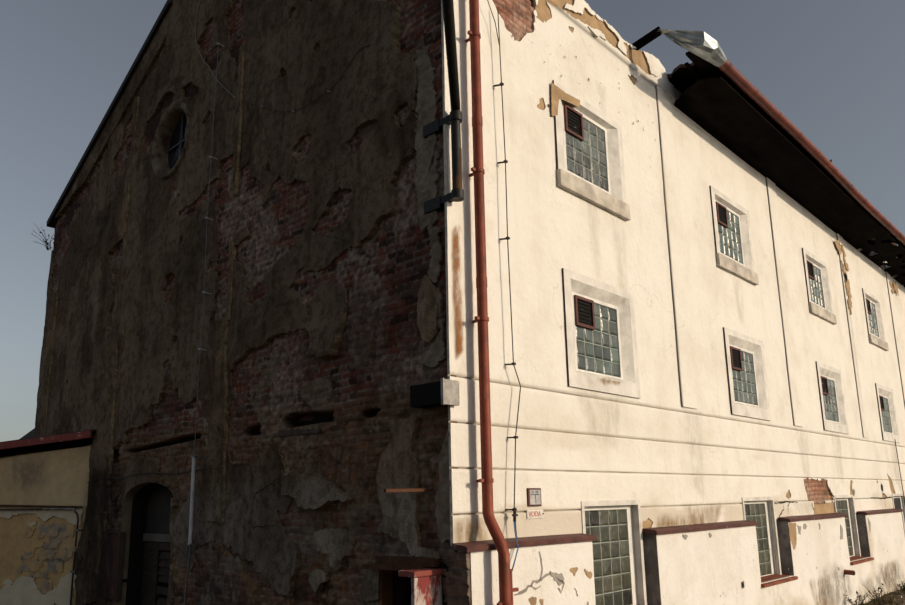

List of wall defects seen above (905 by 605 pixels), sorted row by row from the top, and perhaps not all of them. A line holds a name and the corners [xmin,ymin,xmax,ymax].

spalling [492,0,658,77]
spalling [537,82,580,116]
spalling [170,0,471,605]
corrosion [453,229,463,356]
spalling [835,240,852,315]
spalling [110,360,208,516]
peeling [0,508,83,526]
peeling [789,523,807,549]
spalling [803,477,835,530]
peeling [0,570,77,605]
peeling [514,551,592,605]